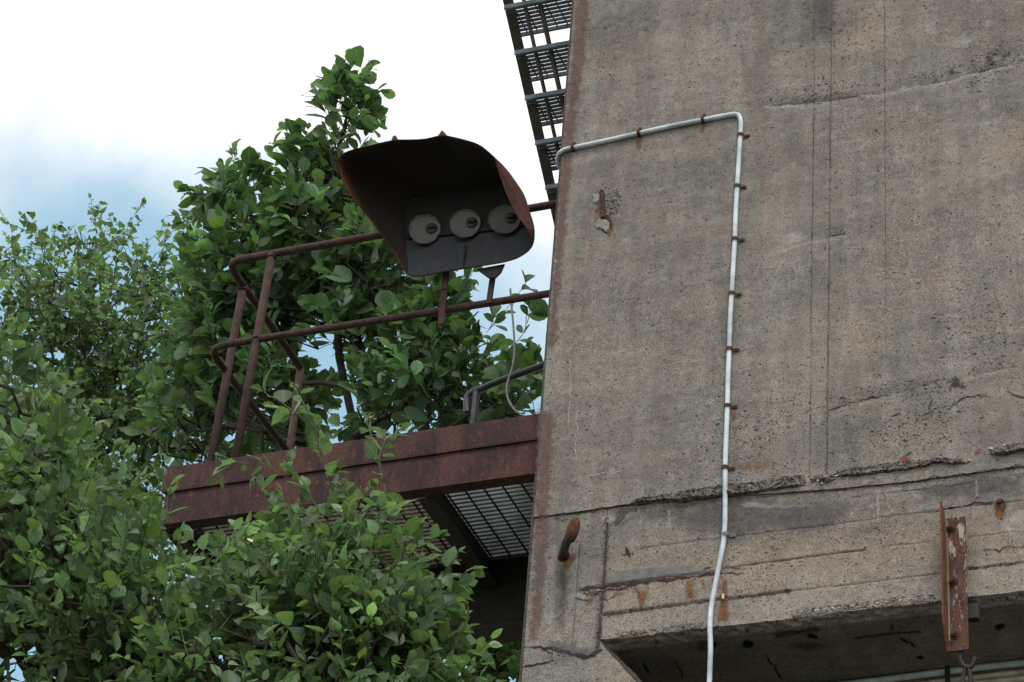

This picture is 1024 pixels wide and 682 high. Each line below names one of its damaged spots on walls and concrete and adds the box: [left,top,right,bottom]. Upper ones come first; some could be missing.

crack [829,391,1024,425]
spalling [606,457,971,525]
corrosion [575,564,728,621]